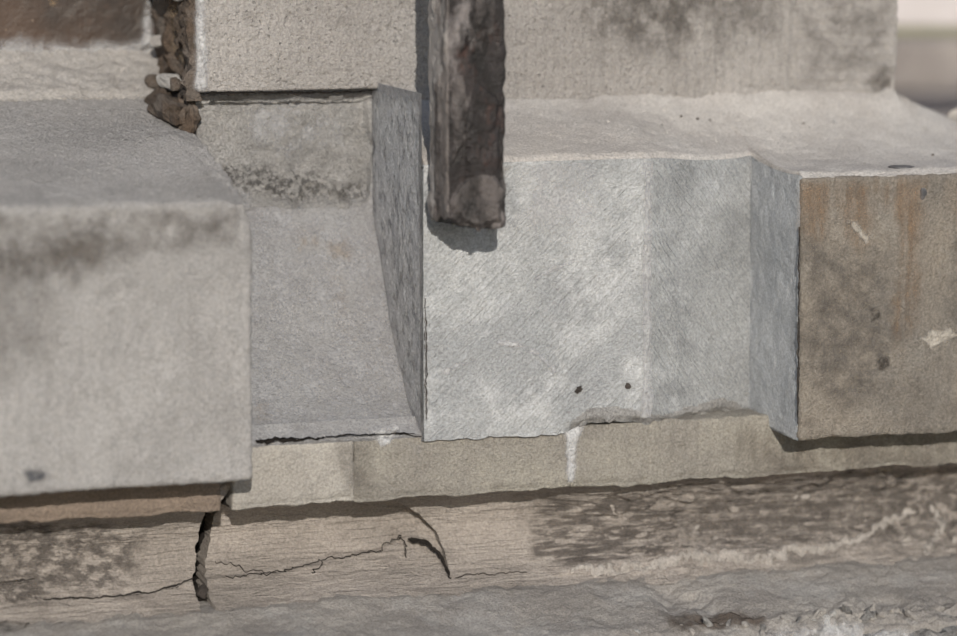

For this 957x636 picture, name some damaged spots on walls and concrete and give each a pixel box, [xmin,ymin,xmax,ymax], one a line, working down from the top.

rust [452,3,469,58]
rust [447,75,506,231]
crack [0,481,527,602]